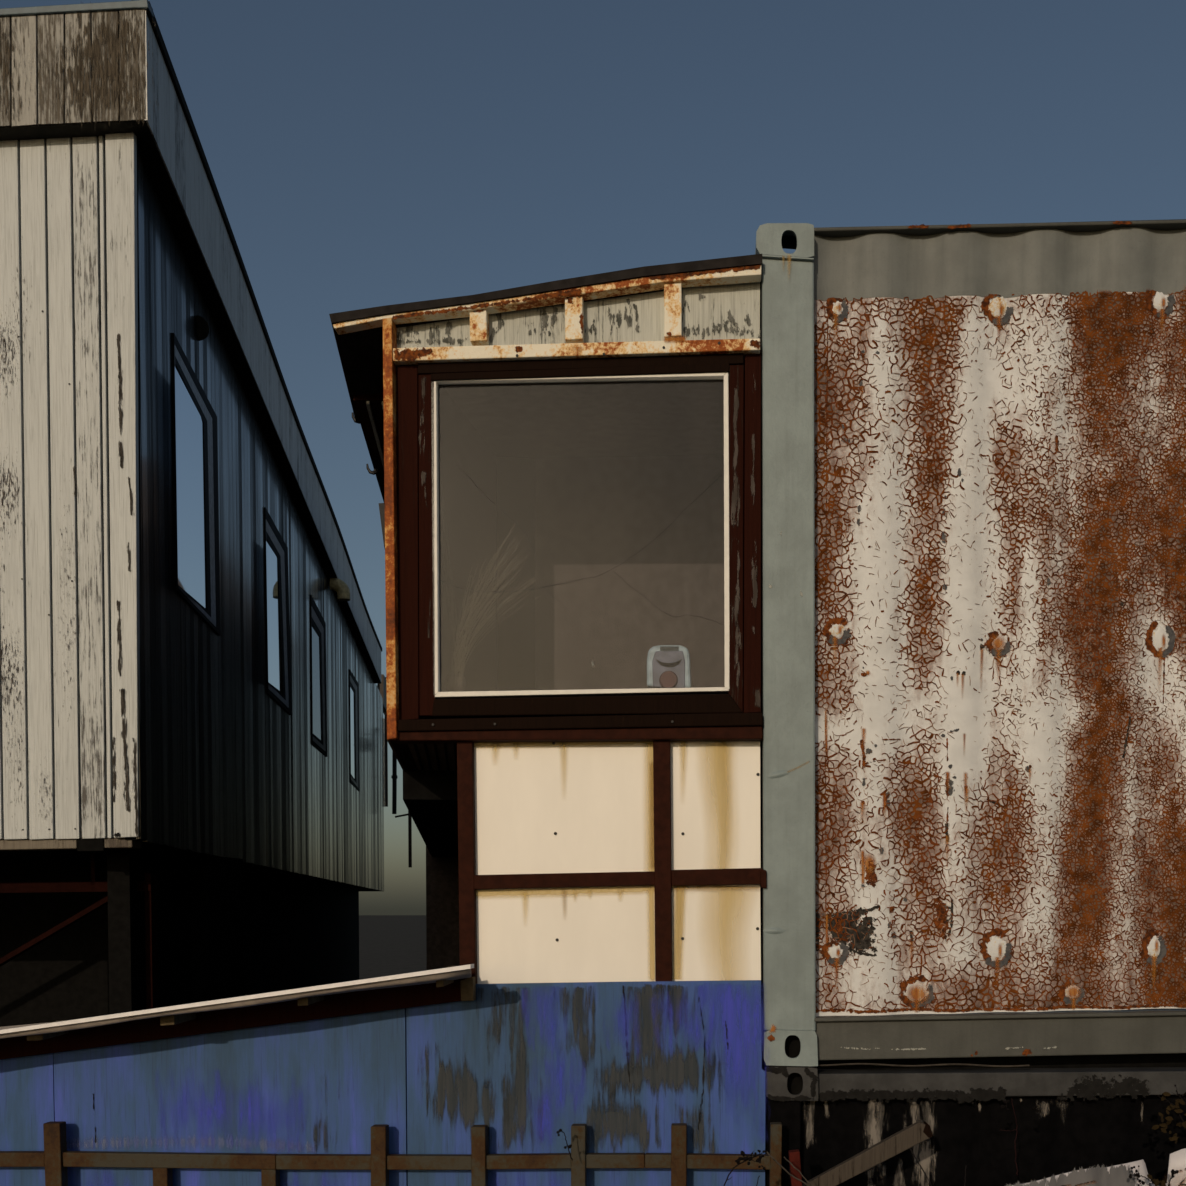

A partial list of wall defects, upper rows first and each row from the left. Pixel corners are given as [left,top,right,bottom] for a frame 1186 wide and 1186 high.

corrosion [393,347,433,362]
corrosion [393,289,584,333]
corrosion [649,265,760,280]
peeling [682,293,761,339]
corrosion [814,291,1186,1014]
damp [474,742,654,871]
damp [710,743,726,851]
damp [476,886,655,980]
damp [672,885,750,980]
peeling [816,896,908,957]
peeling [425,987,543,1154]
peeling [554,984,723,1153]